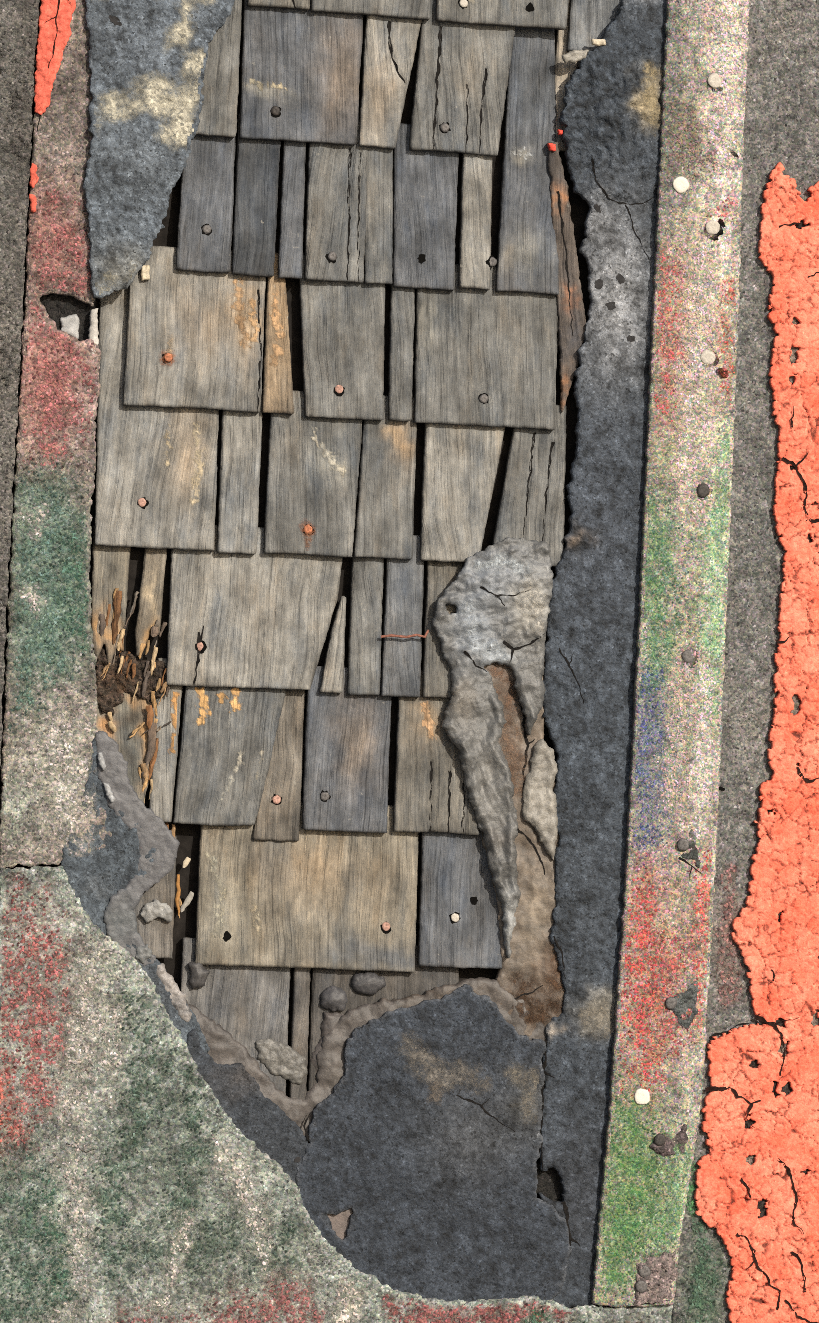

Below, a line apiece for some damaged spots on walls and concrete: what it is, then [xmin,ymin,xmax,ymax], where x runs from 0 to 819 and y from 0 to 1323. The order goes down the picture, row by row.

peeling [562,39,606,63]
peeling [140,265,150,281]
peeling [60,308,99,354]
peeling [248,298,260,342]
crack [782,406,819,523]
peeling [217,687,241,712]
peeling [97,752,115,803]
crack [797,767,819,783]
crack [705,1016,799,1128]
crack [736,1158,818,1323]